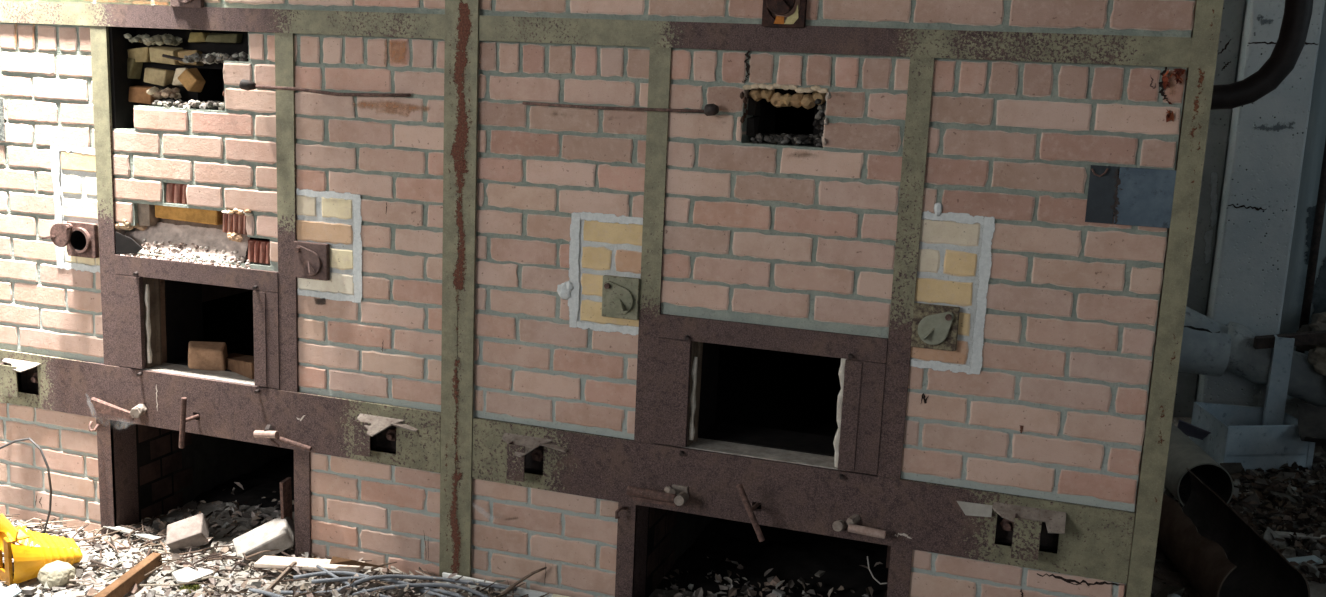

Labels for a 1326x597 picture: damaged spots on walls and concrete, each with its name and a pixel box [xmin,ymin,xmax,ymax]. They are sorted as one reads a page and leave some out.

corrosion [1162,68,1206,196]
corrosion [444,0,472,574]
crack [1020,573,1121,597]